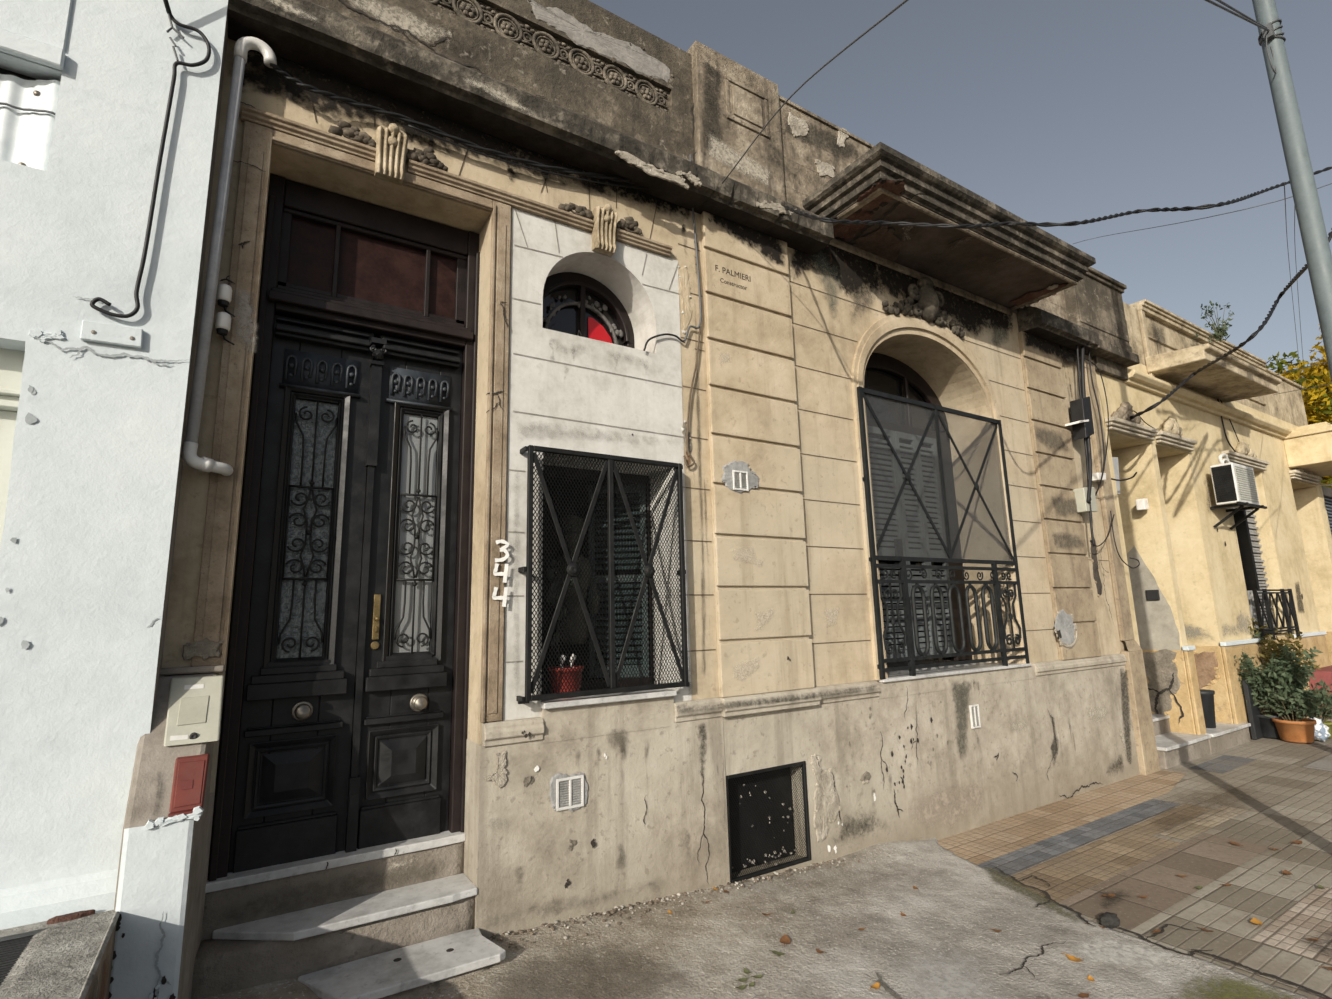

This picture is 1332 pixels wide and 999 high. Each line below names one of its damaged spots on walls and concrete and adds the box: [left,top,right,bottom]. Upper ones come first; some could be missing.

spalling [615,150,702,190]
crack [35,337,190,366]
leakage [953,682,969,754]
crack [1148,673,1184,722]
crack [994,710,1103,799]
crack [697,770,710,884]
crack [155,911,171,999]